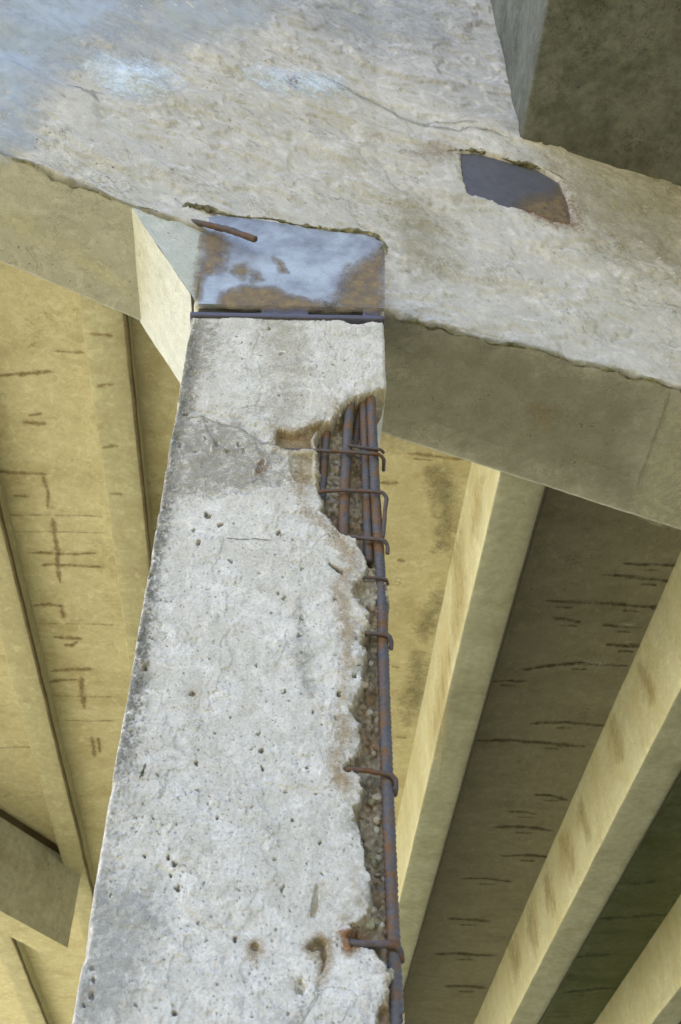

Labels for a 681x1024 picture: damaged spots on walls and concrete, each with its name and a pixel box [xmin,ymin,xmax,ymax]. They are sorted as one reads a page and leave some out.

spalling [498,156,565,182]
corrosion [194,232,389,312]
spalling [275,388,405,1024]
corrosion [306,925,364,974]